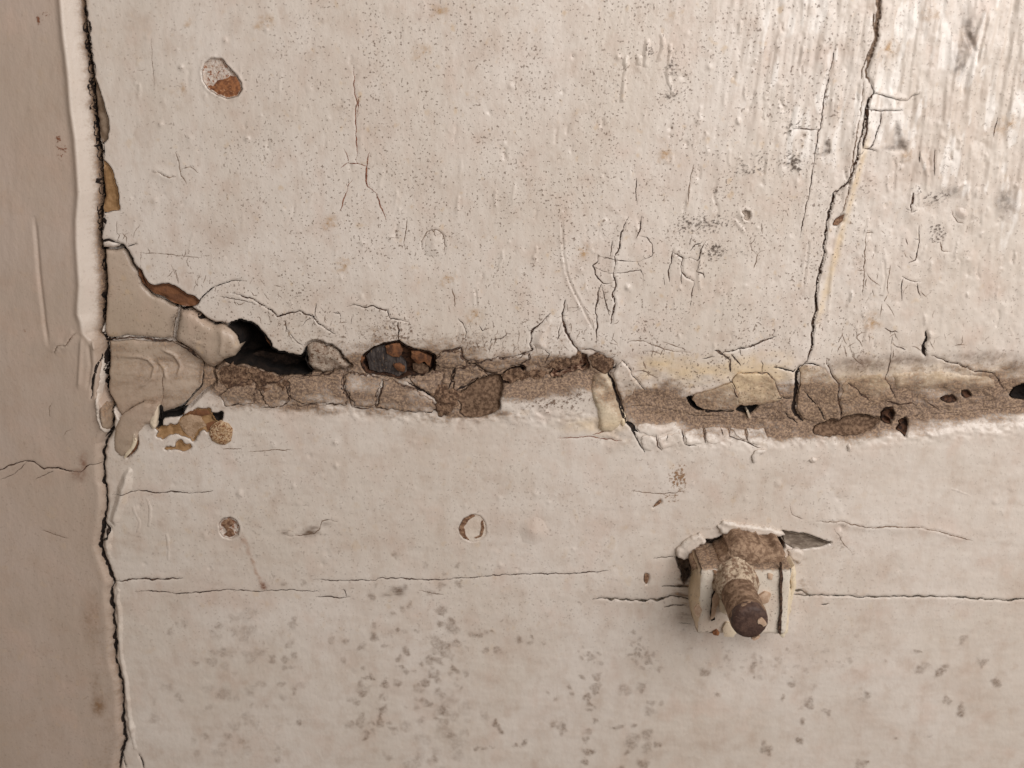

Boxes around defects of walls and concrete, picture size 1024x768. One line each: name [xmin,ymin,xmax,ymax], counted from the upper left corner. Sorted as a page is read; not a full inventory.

crack [408,0,1012,452]
peeling [139,268,200,306]
spalling [550,353,589,377]
crack [0,5,608,768]
peeling [458,365,525,417]
spalling [940,389,971,402]
peeling [150,402,218,451]
peeling [637,421,768,463]
peeling [813,407,908,437]
crack [791,511,969,548]
crack [596,585,715,624]
crack [778,562,1024,635]